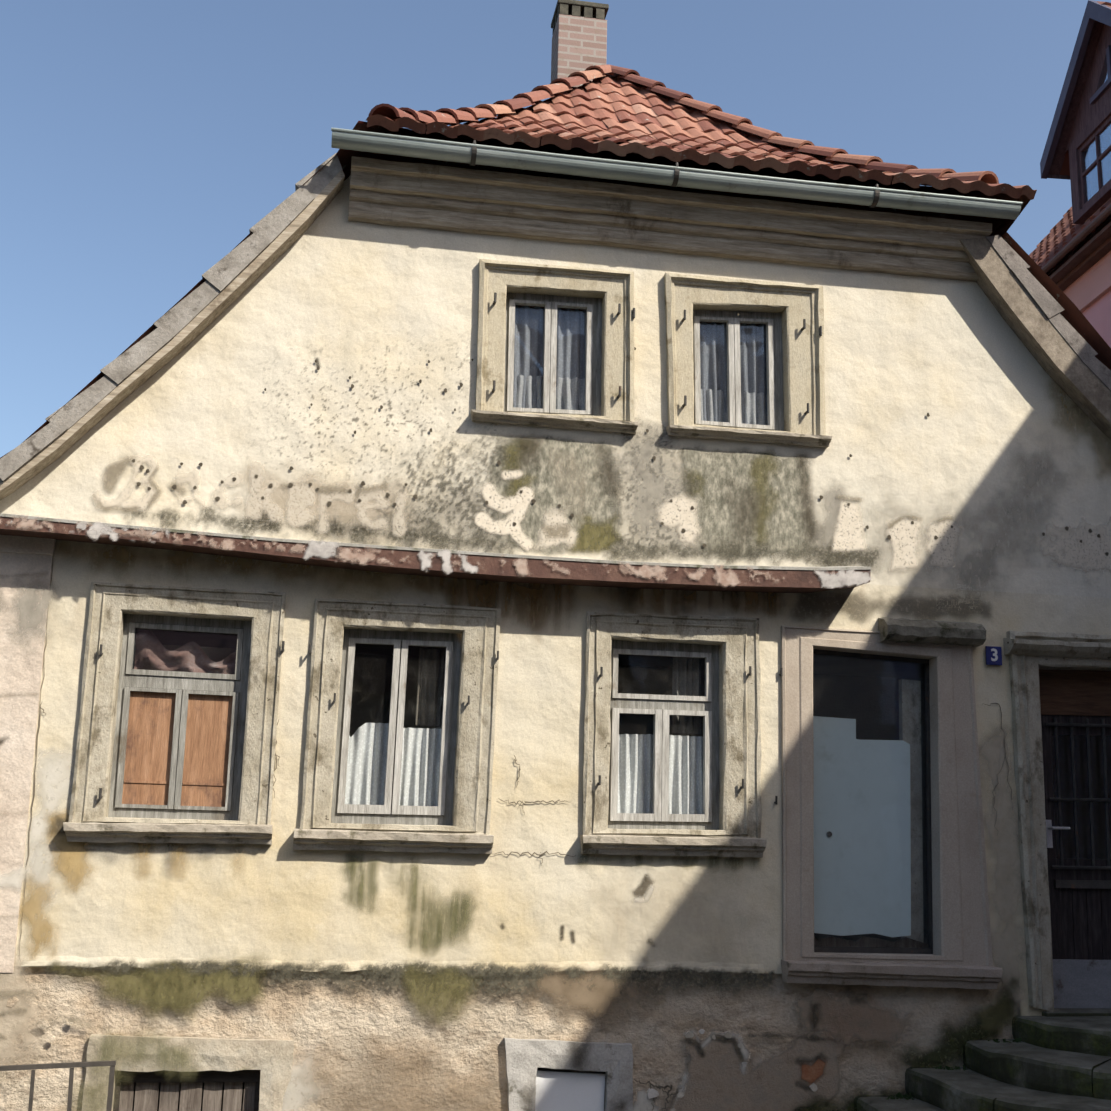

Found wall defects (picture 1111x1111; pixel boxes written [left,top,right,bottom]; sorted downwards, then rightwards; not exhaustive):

peeling [0,518,53,531]
peeling [77,522,234,550]
mould [199,508,281,534]
peeling [251,539,479,574]
damp [300,443,513,553]
damp [610,430,878,567]
crack [500,755,568,814]
damp [50,813,103,887]
crack [495,851,576,866]
spalling [633,875,653,902]
mould [80,960,774,1021]
flaking render [633,988,912,1111]